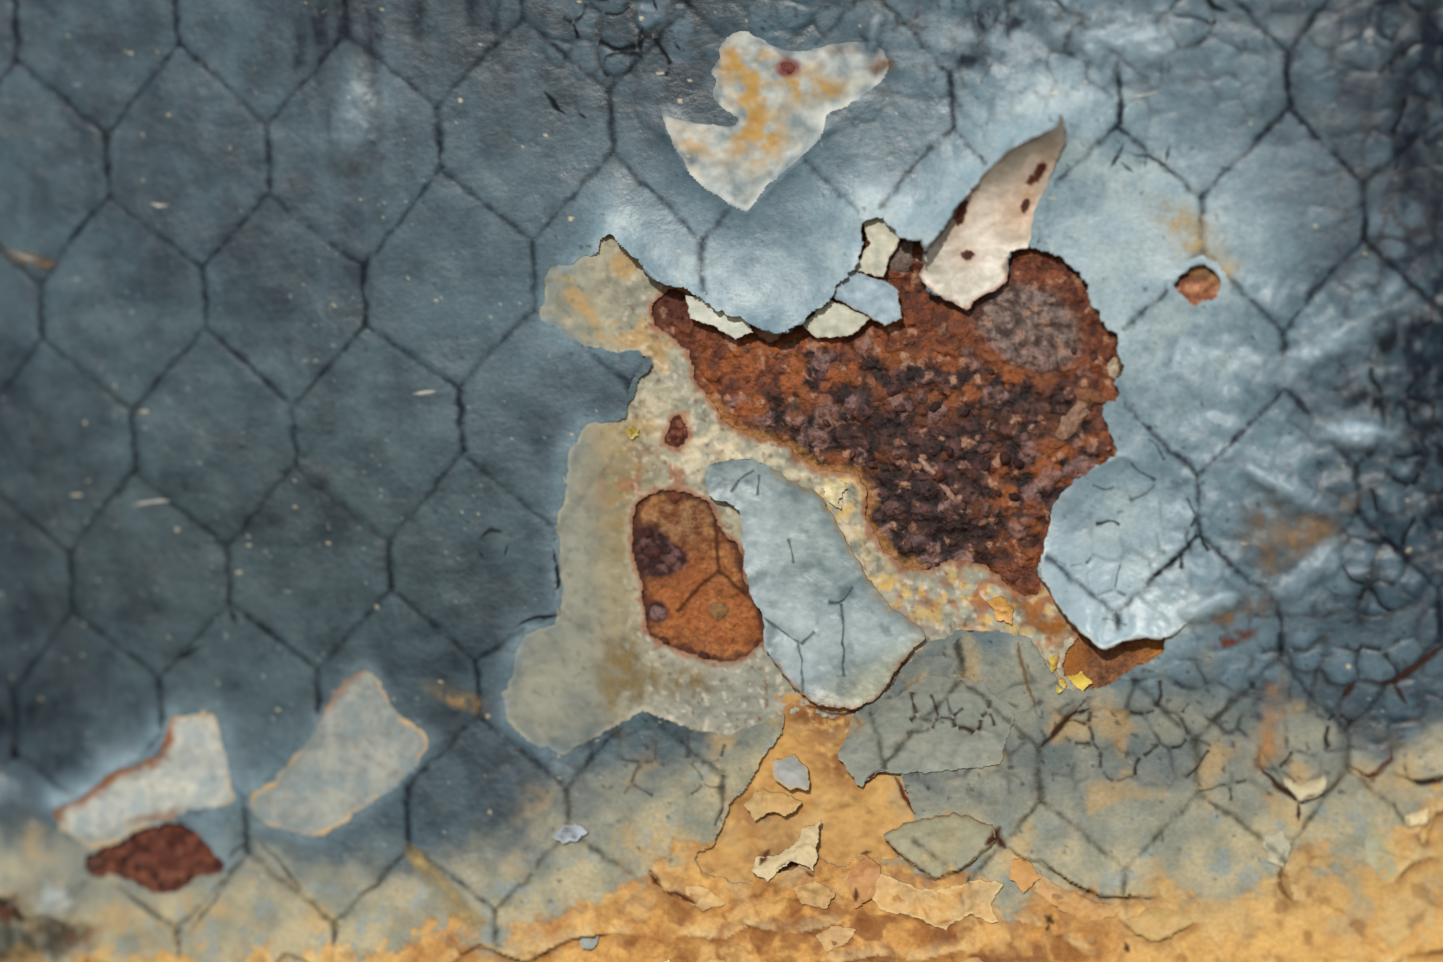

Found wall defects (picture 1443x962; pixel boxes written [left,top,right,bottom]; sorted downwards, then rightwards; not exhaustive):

peeling [662,31,889,211]
peeling [919,114,1066,309]
rust [1174,241,1229,306]
rust [652,217,1165,691]
peeling [52,670,428,848]
peeling [501,218,1200,941]
crack [764,587,995,734]
crack [1153,507,1210,577]
crack [1017,646,1443,820]
damp [0,923,75,957]
rust [86,823,224,893]
crack [760,850,812,876]